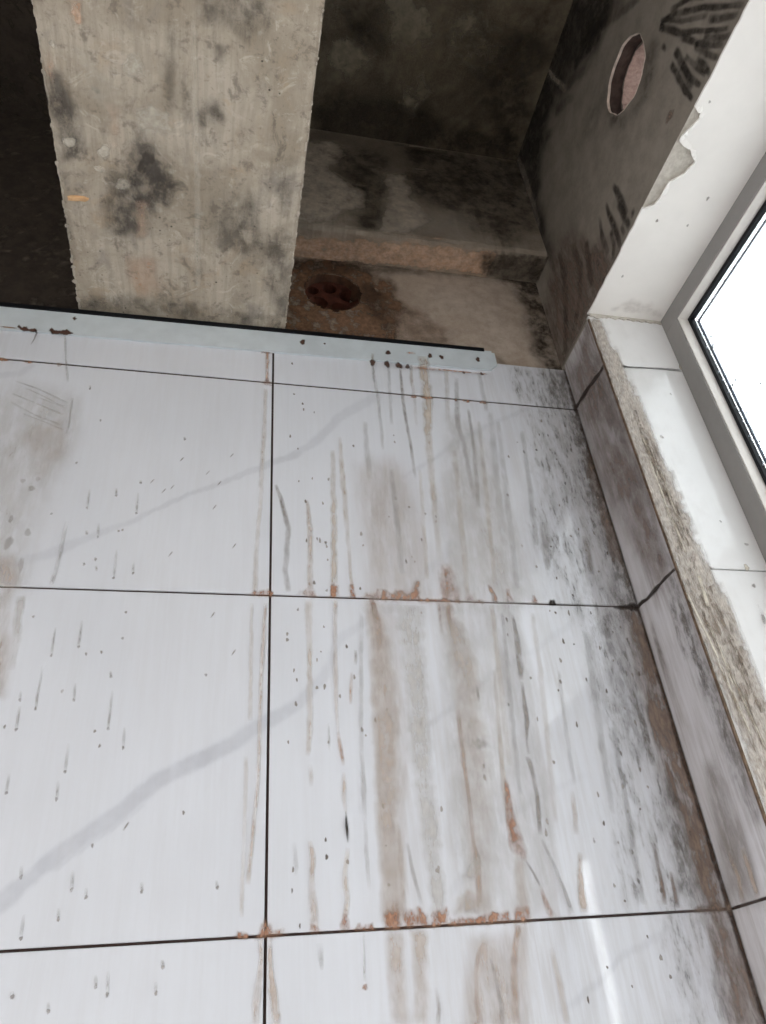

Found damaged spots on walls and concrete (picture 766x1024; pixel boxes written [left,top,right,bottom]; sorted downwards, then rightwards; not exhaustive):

flaking render [642,105,705,210]
damp [108,147,167,235]
corrosion [4,317,77,341]
damp [298,0,766,1024]
corrosion [374,569,459,612]
corrosion [237,922,280,939]
corrosion [385,902,529,959]